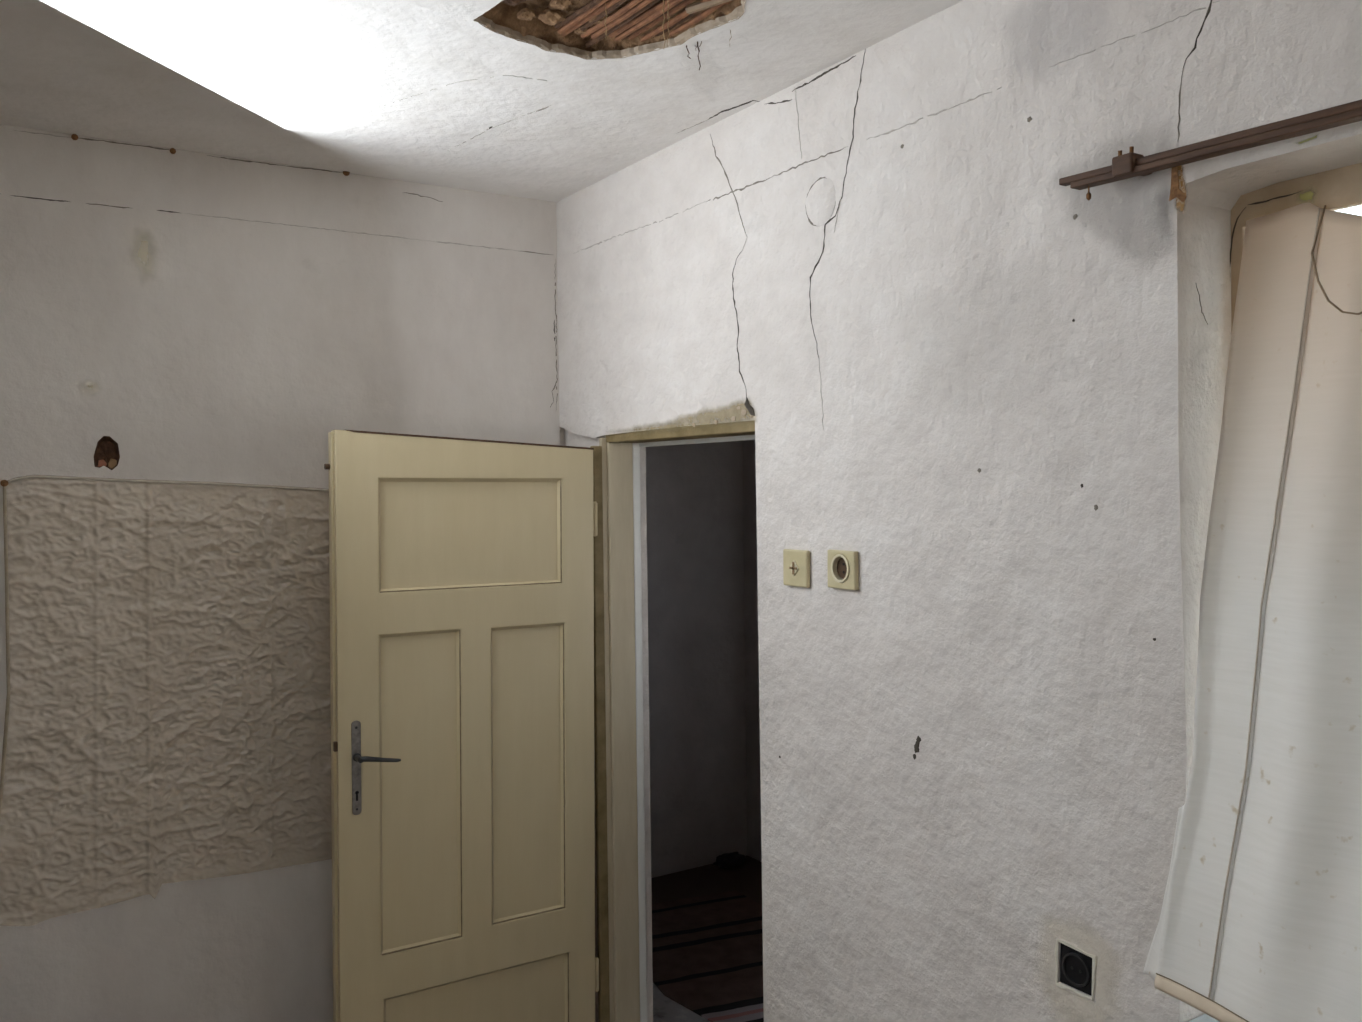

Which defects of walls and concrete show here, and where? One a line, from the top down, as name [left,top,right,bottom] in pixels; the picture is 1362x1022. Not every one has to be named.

crack [1050,0,1219,140]
crack [10,49,1002,430]
spalling [94,436,120,470]